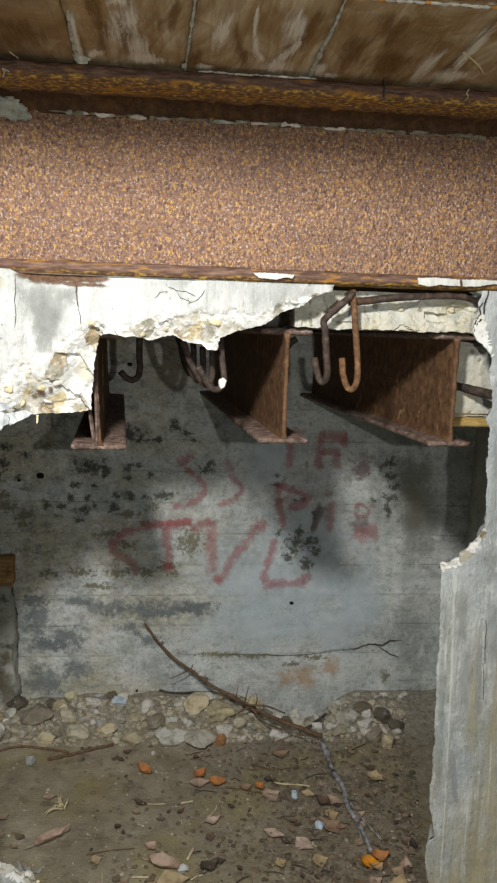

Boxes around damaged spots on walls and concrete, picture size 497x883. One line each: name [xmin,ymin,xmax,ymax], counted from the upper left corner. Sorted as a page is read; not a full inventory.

peeling [254,272,294,280]
spalling [0,277,497,431]
corrosion [88,350,107,448]
water stain [126,420,200,445]
water stain [0,456,180,528]
water stain [174,528,206,557]
spalling [439,528,487,572]
crack [225,640,401,658]
spalling [0,862,40,883]